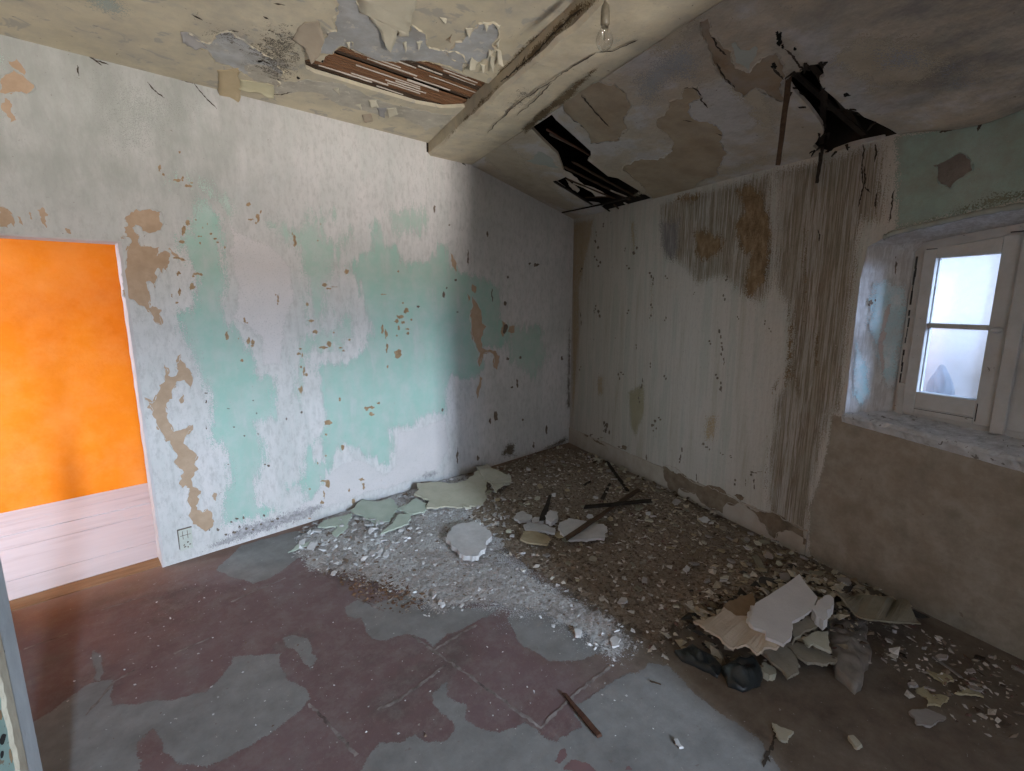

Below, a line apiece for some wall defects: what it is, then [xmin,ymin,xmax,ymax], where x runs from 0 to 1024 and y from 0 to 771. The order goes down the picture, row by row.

peeling [0,59,36,122]
peeling [180,30,455,131]
peeling [320,0,504,76]
leakage [449,0,599,136]
peeling [121,165,521,584]
flaking render [622,86,1024,660]